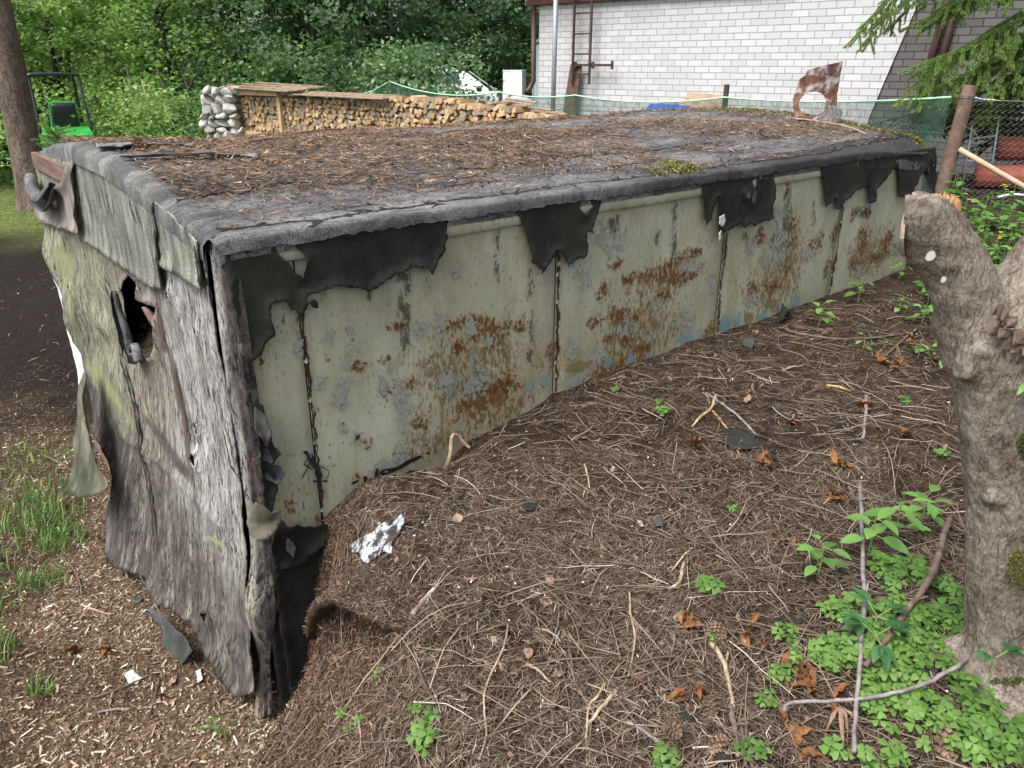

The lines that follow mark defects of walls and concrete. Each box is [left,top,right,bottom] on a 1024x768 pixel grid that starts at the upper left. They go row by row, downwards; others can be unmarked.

rust [351,305,540,463]
rust [577,244,717,384]
rust [737,209,901,320]